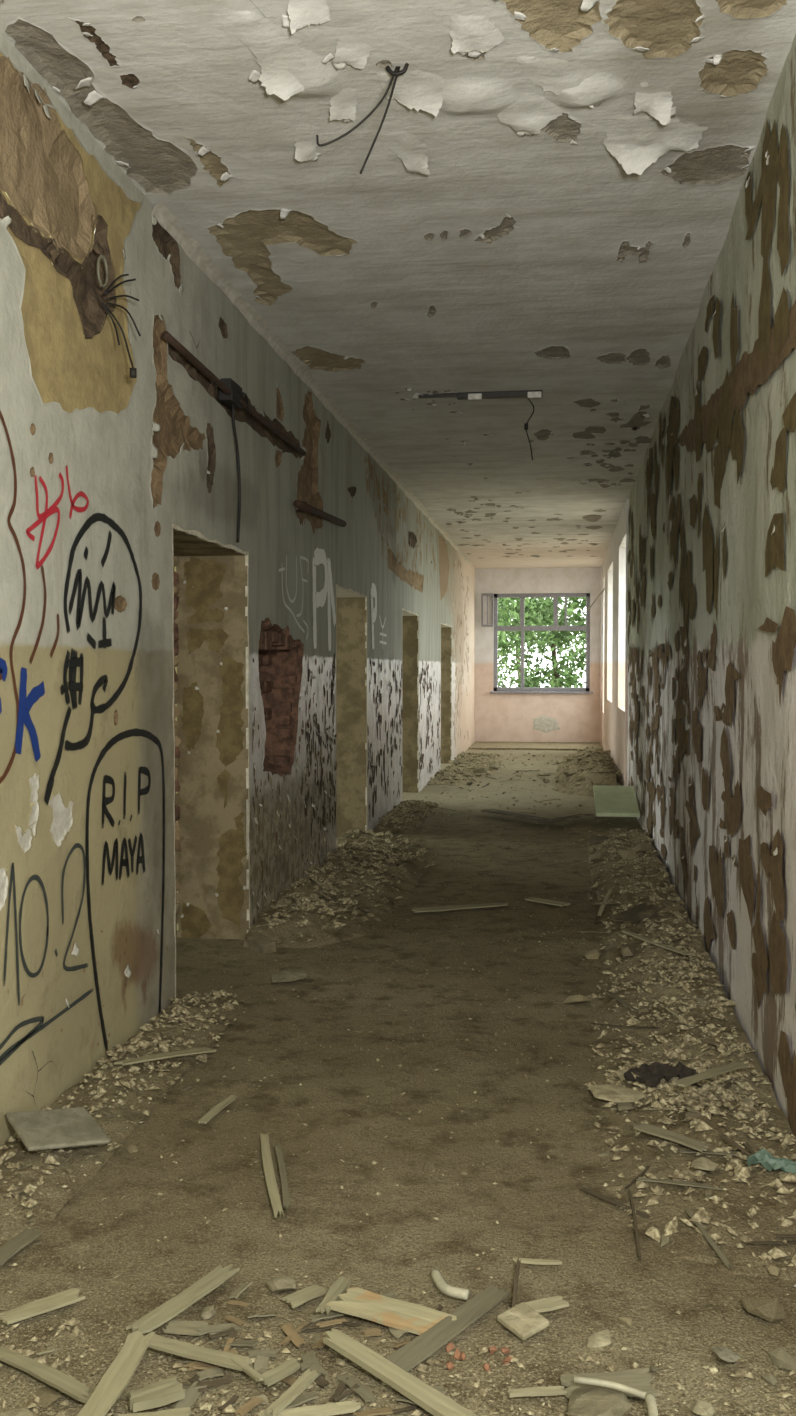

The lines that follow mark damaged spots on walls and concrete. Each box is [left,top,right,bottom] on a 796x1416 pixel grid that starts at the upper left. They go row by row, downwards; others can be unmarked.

peeling [209,0,450,117]
spalling [423,213,517,244]
peeling [448,0,796,1009]
spalling [336,454,607,831]
peeling [778,1030,796,1137]